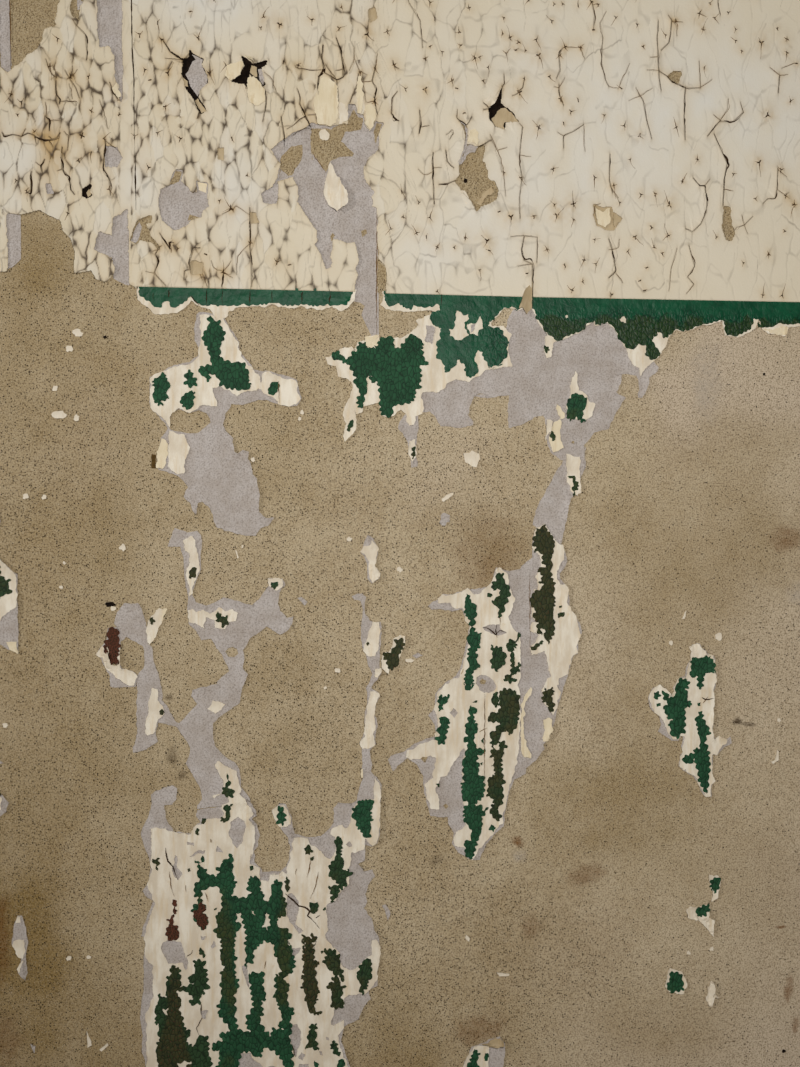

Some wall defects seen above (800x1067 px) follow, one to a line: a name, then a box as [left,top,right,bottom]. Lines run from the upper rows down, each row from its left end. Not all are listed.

crack [3,0,227,219]
crack [149,197,291,287]
peeling [0,0,800,536]
crack [264,0,798,299]
peeling [261,76,800,860]
peeling [0,560,19,654]
peeling [0,793,9,816]
peeling [96,528,423,1067]
peeling [686,874,721,951]
peeling [462,1036,505,1067]